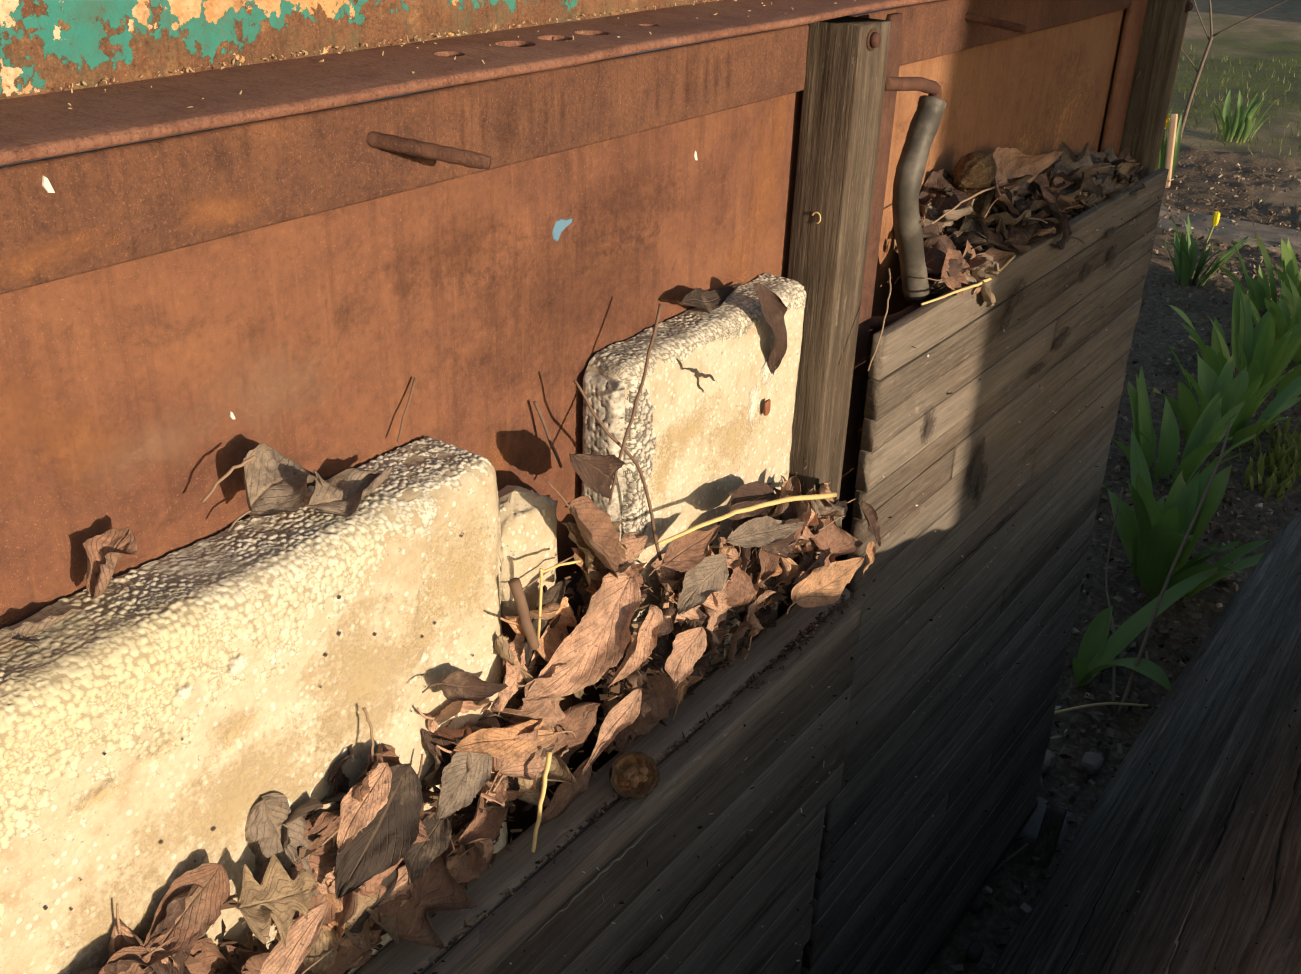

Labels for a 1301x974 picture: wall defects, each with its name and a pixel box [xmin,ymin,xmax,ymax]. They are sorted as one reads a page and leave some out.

peeling [0,0,414,96]
peeling [435,0,538,13]